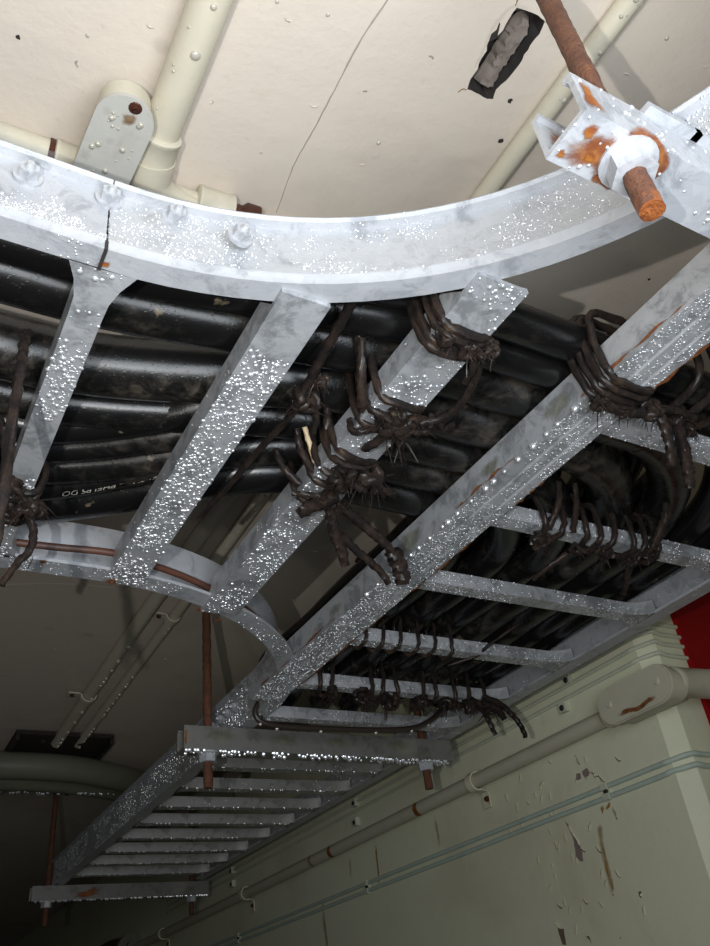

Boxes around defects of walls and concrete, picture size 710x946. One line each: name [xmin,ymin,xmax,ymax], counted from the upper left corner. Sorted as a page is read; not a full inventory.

peeling [575,756,604,782]
peeling [548,823,602,864]
peeling [554,920,591,945]